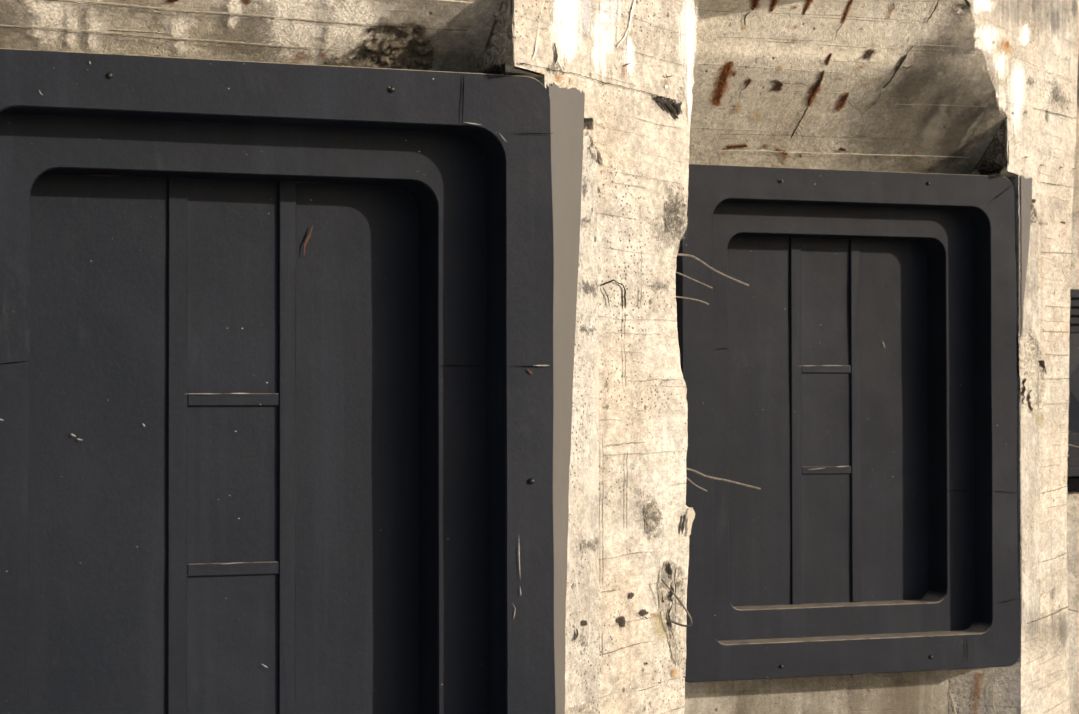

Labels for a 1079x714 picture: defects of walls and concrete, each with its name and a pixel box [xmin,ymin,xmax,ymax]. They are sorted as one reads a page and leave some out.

rust [743,0,777,30]
spalling [323,23,435,70]
rust [711,61,754,113]
rust [836,92,855,112]
spalling [972,121,1007,175]
spalling [639,560,685,666]